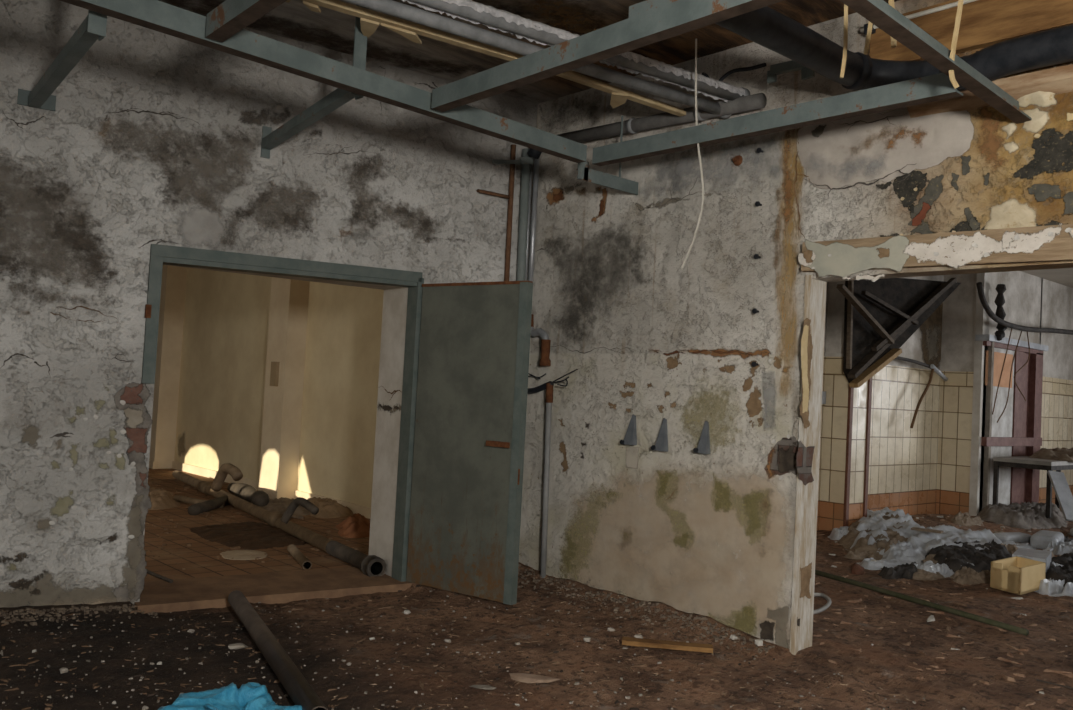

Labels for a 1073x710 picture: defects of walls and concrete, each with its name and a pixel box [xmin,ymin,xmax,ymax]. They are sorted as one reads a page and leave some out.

damp [0,158,117,302]
crack [105,108,200,125]
damp [100,109,290,216]
damp [223,183,319,244]
damp [342,154,436,240]
peeling [798,112,1073,282]
peeling [608,381,653,413]
corrosion [652,349,771,359]
peeling [742,318,815,486]
flaking render [68,382,153,602]
damp [560,472,786,629]
peeling [800,562,812,599]